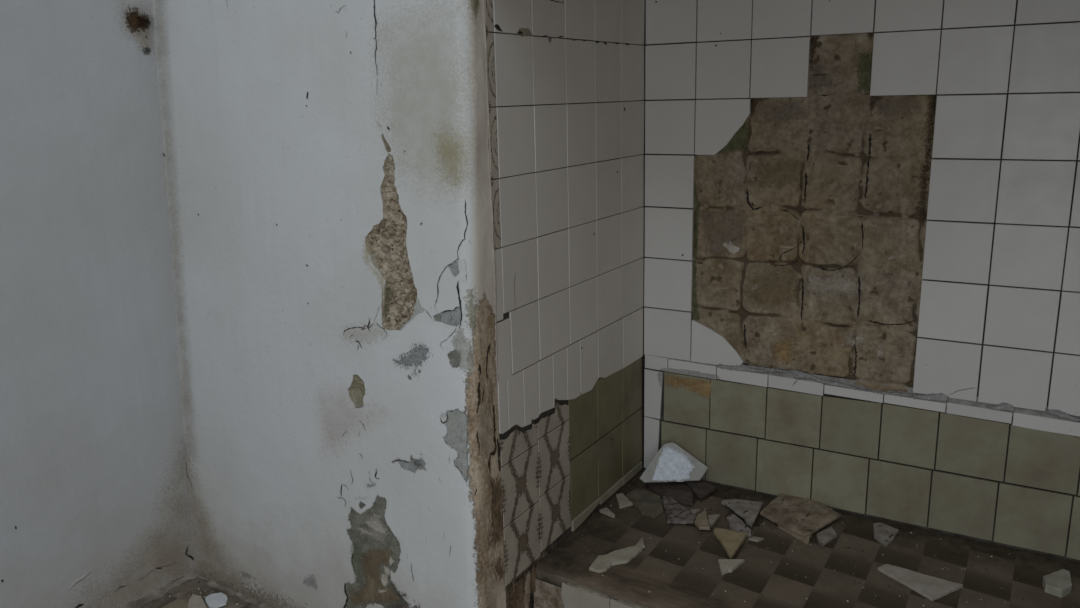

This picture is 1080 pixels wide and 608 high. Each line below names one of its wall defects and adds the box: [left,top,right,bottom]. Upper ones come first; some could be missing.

rust [125,8,149,45]
crack [371,0,379,67]
peeling [692,31,939,392]
crack [426,199,470,351]
spalling [365,134,542,608]
peeling [343,495,421,608]
spalling [589,538,645,573]